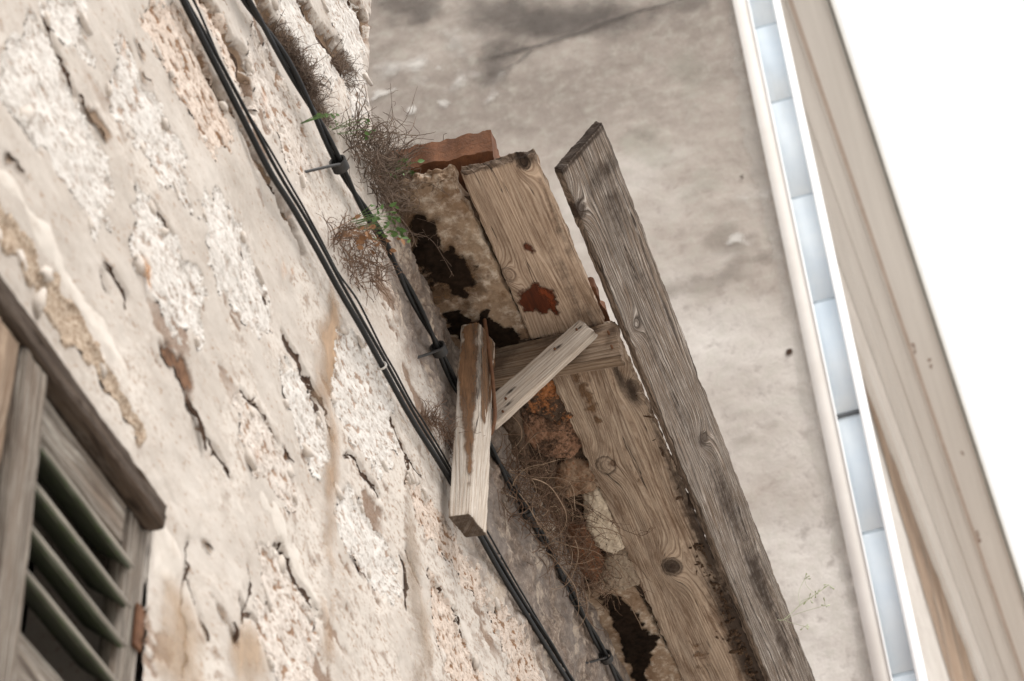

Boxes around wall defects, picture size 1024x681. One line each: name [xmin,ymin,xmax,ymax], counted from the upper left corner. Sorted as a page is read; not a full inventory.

spalling [0,0,116,241]
spalling [138,0,234,163]
spalling [106,29,273,352]
flaking render [0,204,147,447]
crack [186,399,230,479]
spalling [278,356,403,606]
spalling [330,325,400,481]
crack [180,541,252,679]